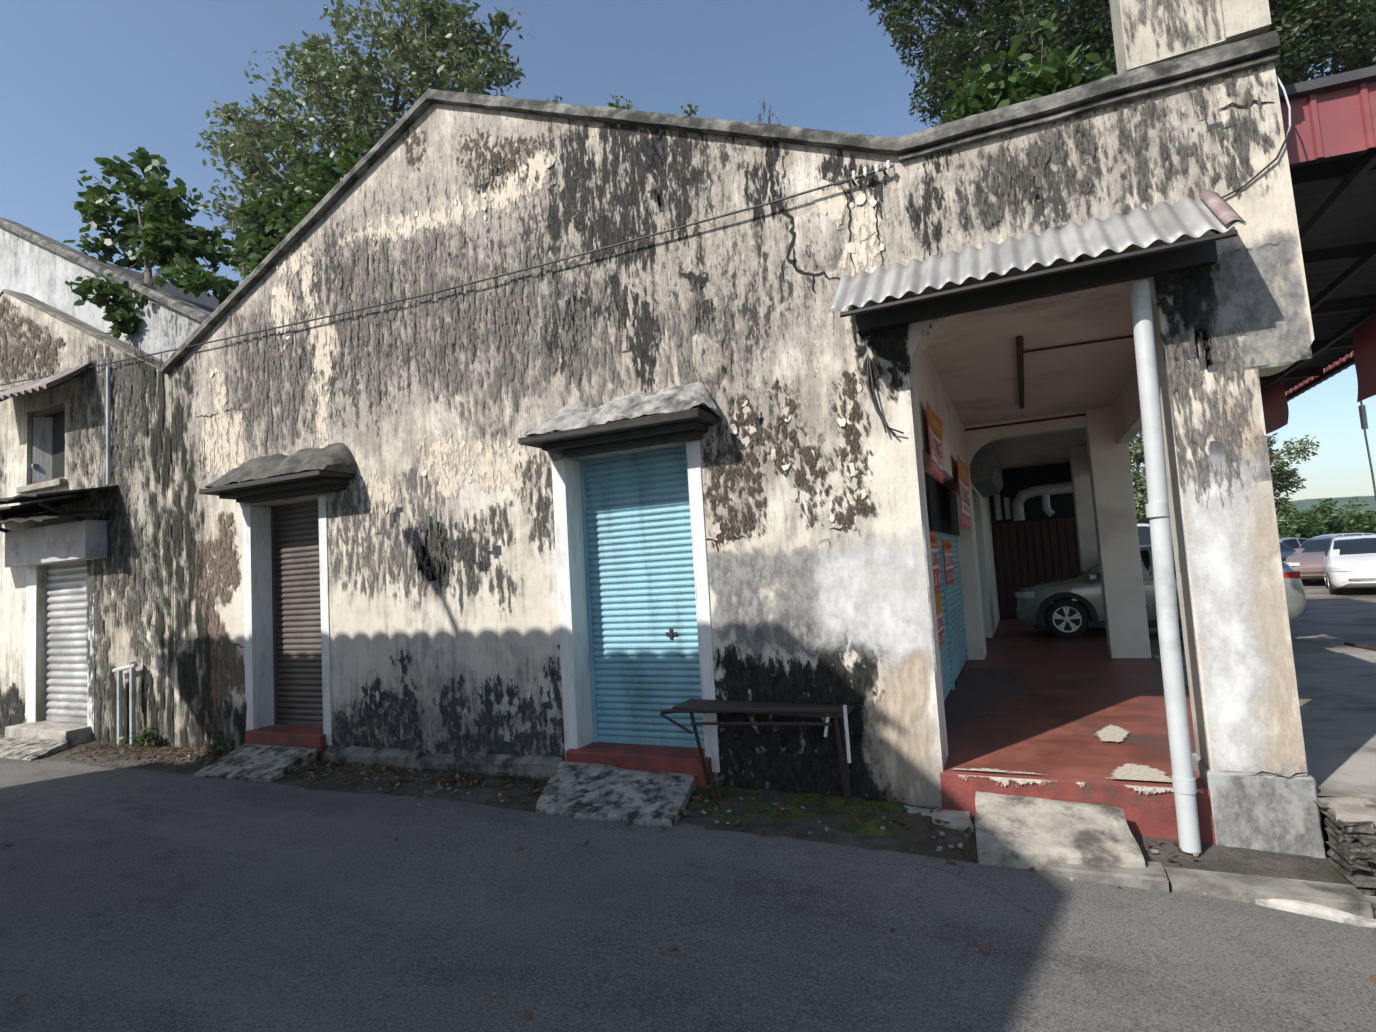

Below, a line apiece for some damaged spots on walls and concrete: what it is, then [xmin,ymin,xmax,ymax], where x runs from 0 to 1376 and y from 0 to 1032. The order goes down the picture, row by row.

damp [329,122,749,451]
damp [742,140,793,232]
crack [766,141,883,292]
peeling [807,174,891,277]
damp [814,64,1282,260]
crack [1217,99,1274,110]
damp [1162,307,1264,508]
damp [66,334,163,746]
damp [326,452,564,614]
damp [706,546,1031,806]
peeling [954,768,1049,787]
peeling [1108,763,1174,795]